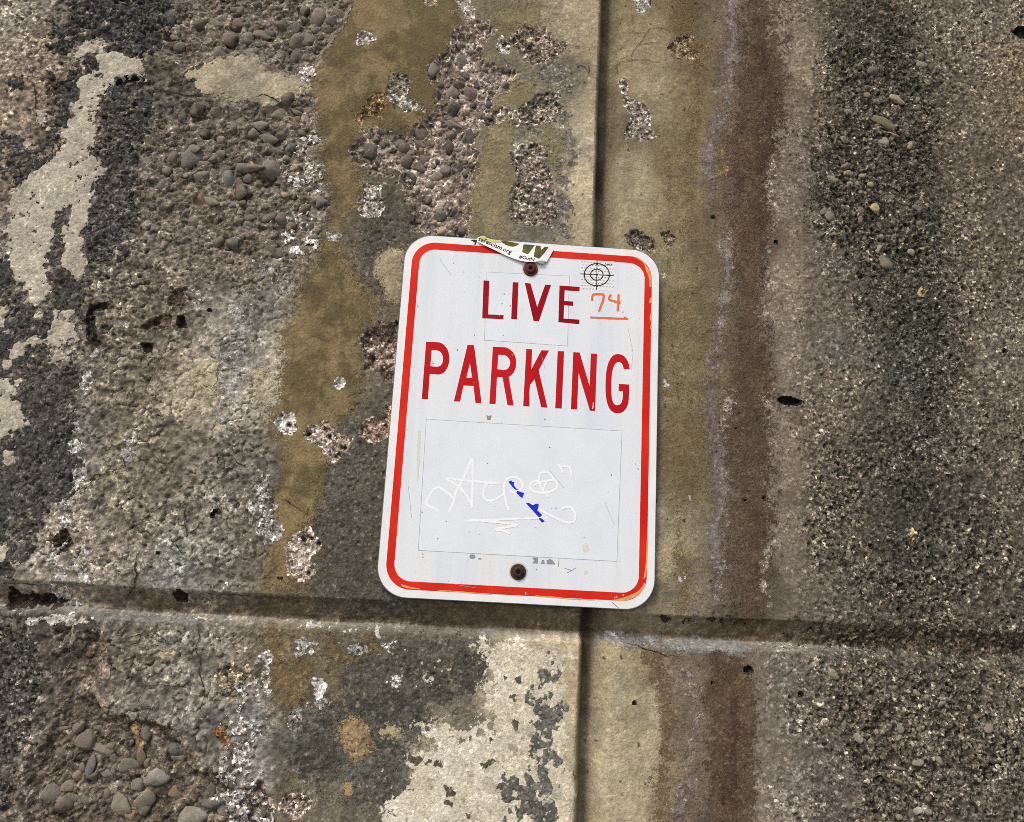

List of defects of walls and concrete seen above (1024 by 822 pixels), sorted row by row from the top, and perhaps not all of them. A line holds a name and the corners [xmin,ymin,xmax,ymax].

spalling [348,0,567,238]
peeling [0,39,147,466]
water stain [753,153,783,342]
water stain [659,0,742,629]
spalling [273,405,391,465]
water stain [762,392,778,420]
peeling [52,444,85,504]
peeling [0,544,8,562]
spalling [248,469,323,583]
water stain [757,537,778,608]
peeling [409,720,433,742]